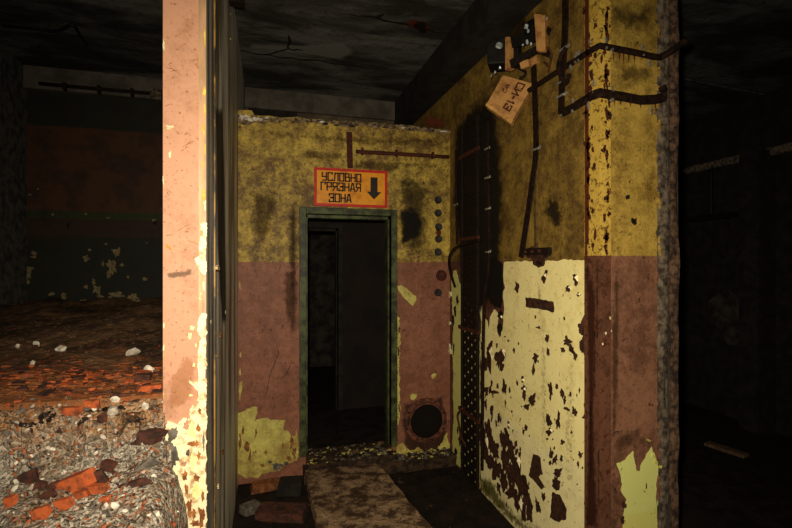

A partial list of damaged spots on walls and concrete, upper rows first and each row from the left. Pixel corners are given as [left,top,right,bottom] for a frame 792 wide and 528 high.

crack [240,35,371,68]
peeling [83,278,140,301]
peeling [101,243,129,278]
peeling [165,313,219,528]
peeling [238,406,299,478]
peeling [396,246,584,528]
corrosion [582,0,641,525]
spalling [616,0,680,528]